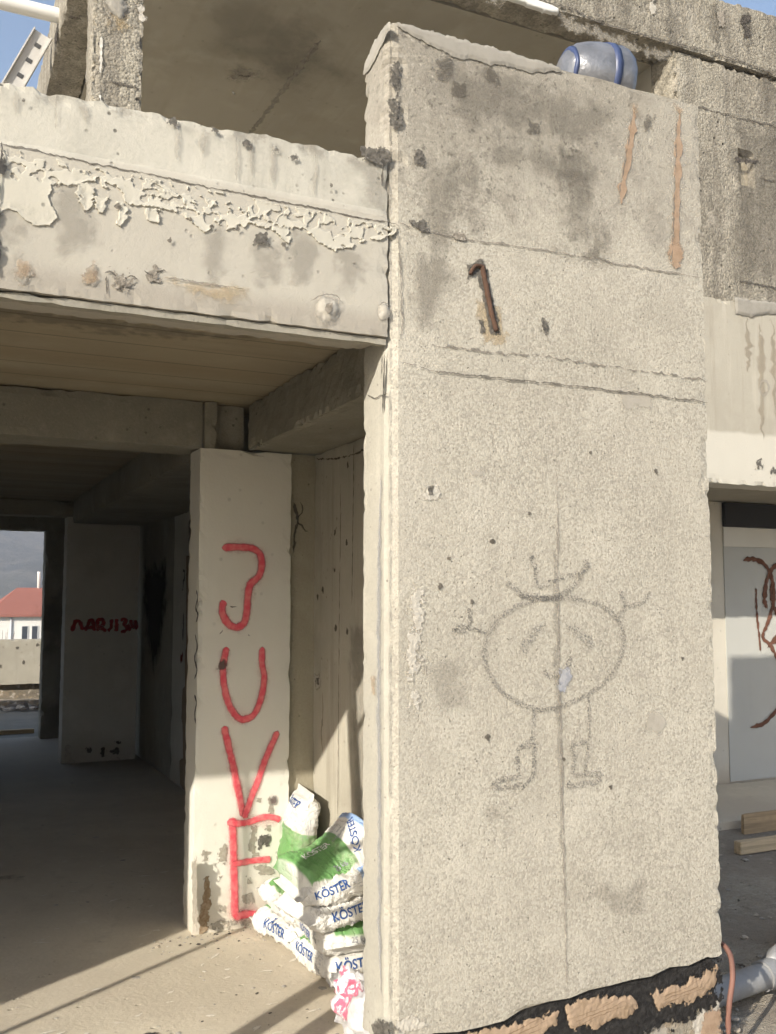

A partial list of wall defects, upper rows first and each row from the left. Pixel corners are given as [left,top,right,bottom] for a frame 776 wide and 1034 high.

peeling [0,146,397,252]
crack [0,143,695,333]
corrosion [615,110,638,204]
corrosion [667,110,685,269]
crack [740,281,776,289]
crack [403,344,706,403]
peeling [191,844,252,934]
peeling [242,797,278,904]
spalling [371,1014,428,1034]